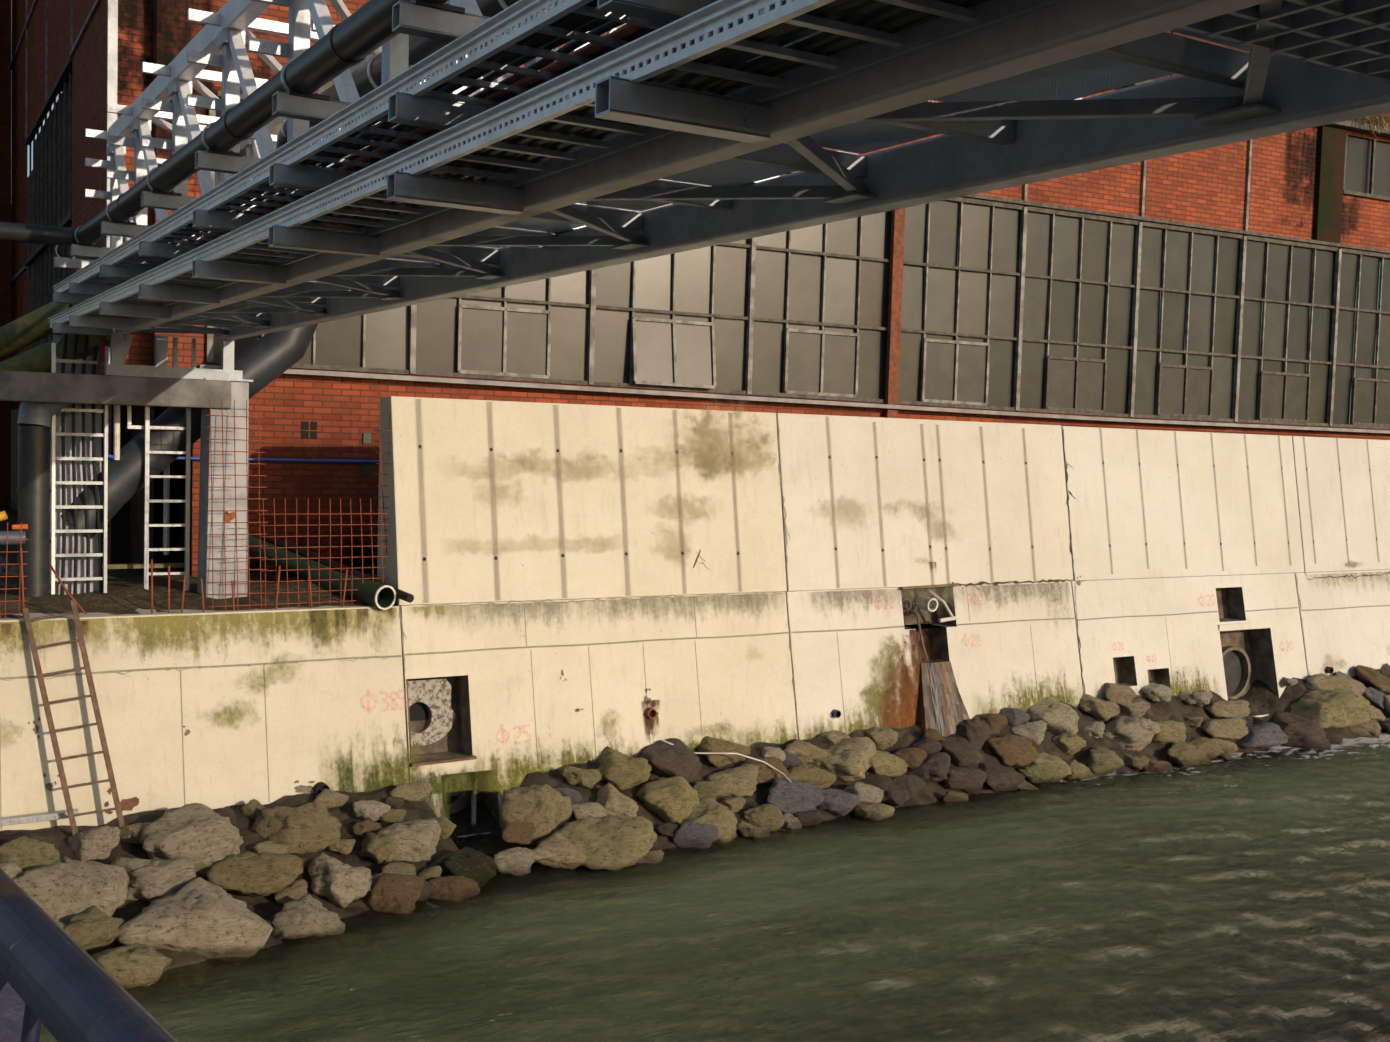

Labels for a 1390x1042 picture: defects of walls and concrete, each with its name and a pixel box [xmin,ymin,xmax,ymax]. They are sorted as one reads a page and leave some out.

leakage [134,608,368,651]
leakage [414,606,445,617]
crack [1296,572,1390,675]
rust [882,629,926,729]
rust [643,700,659,734]
leakage [339,756,407,793]
leakage [424,769,477,819]